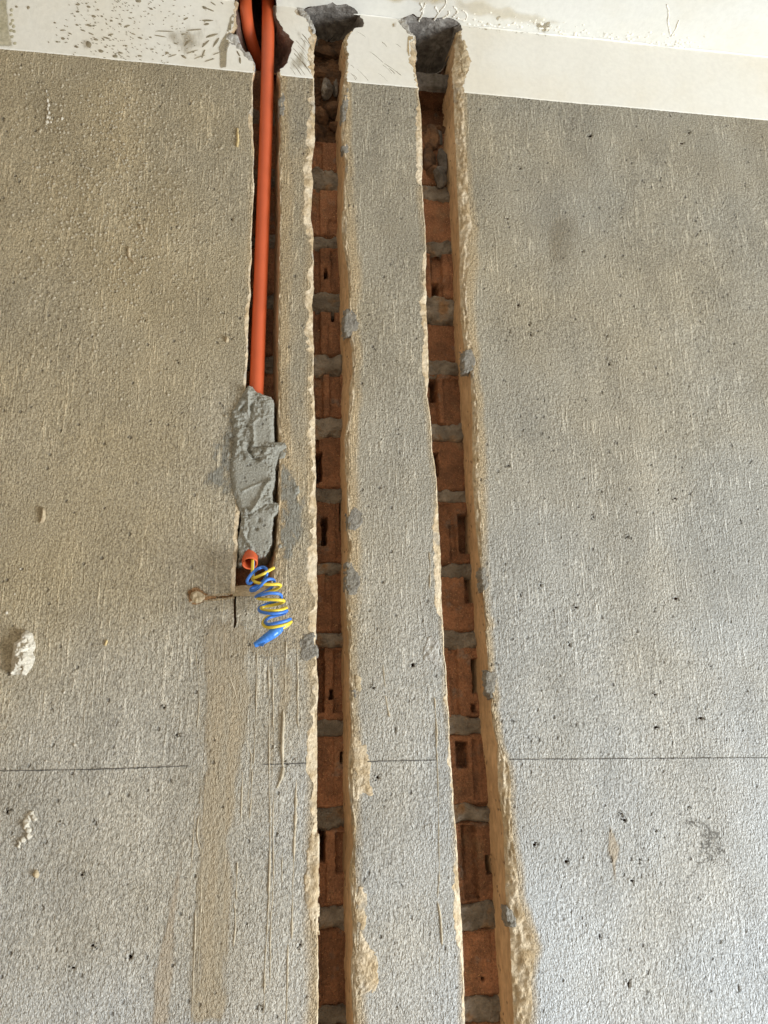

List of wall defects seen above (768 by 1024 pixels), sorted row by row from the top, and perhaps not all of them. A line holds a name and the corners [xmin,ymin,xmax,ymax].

crack [190,591,237,628]